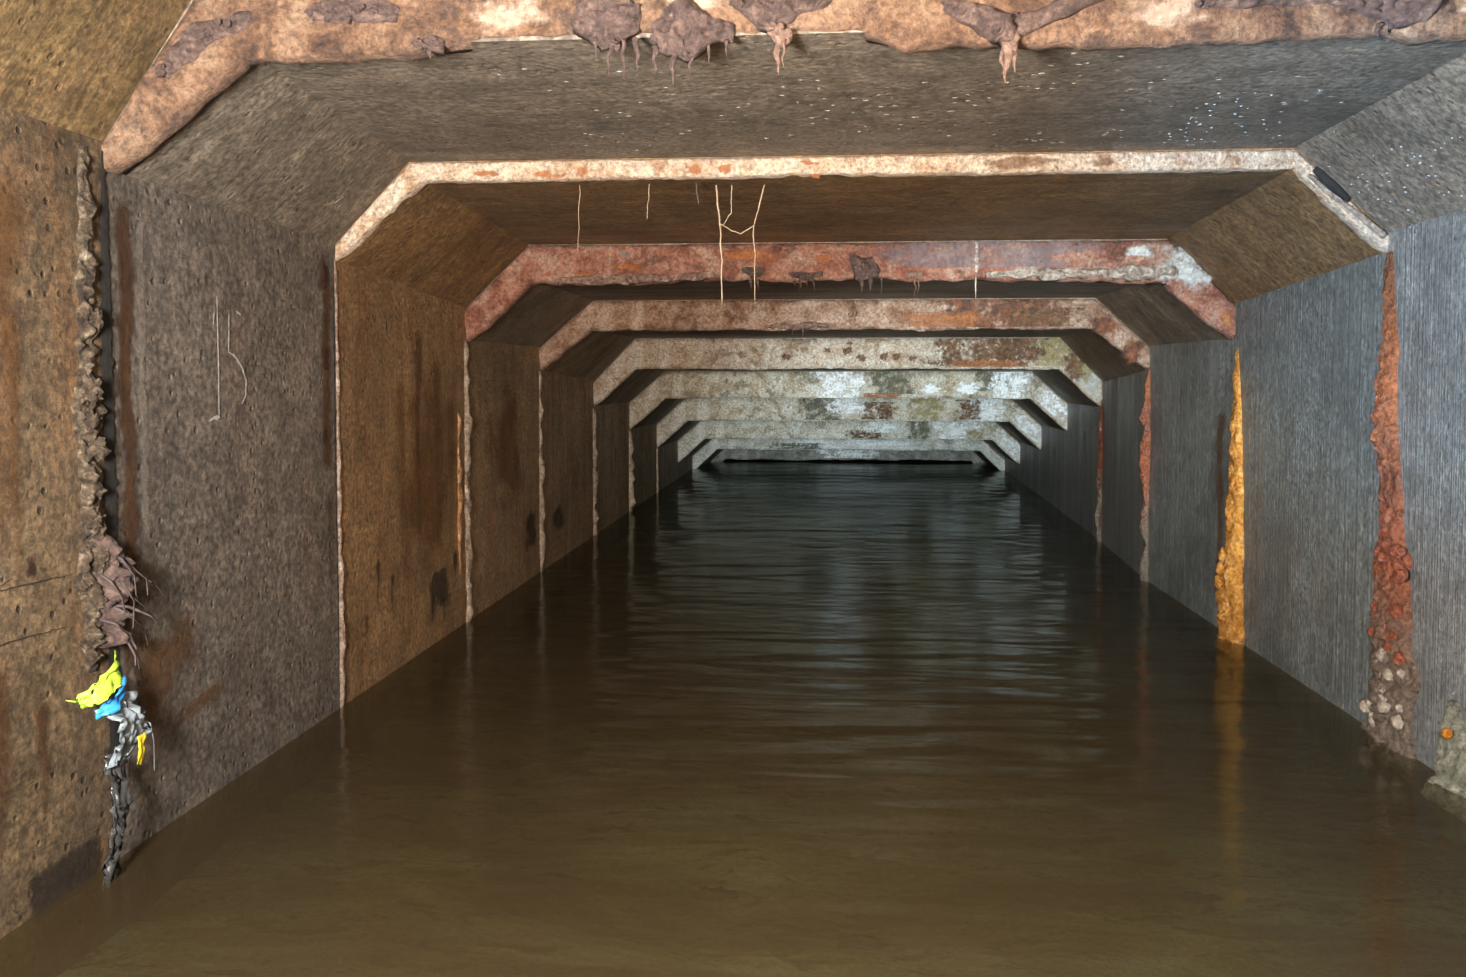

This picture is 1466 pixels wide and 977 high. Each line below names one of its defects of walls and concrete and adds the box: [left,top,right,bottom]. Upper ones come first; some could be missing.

damp [334,259,347,719]
damp [464,340,474,630]
damp [1358,251,1466,823]